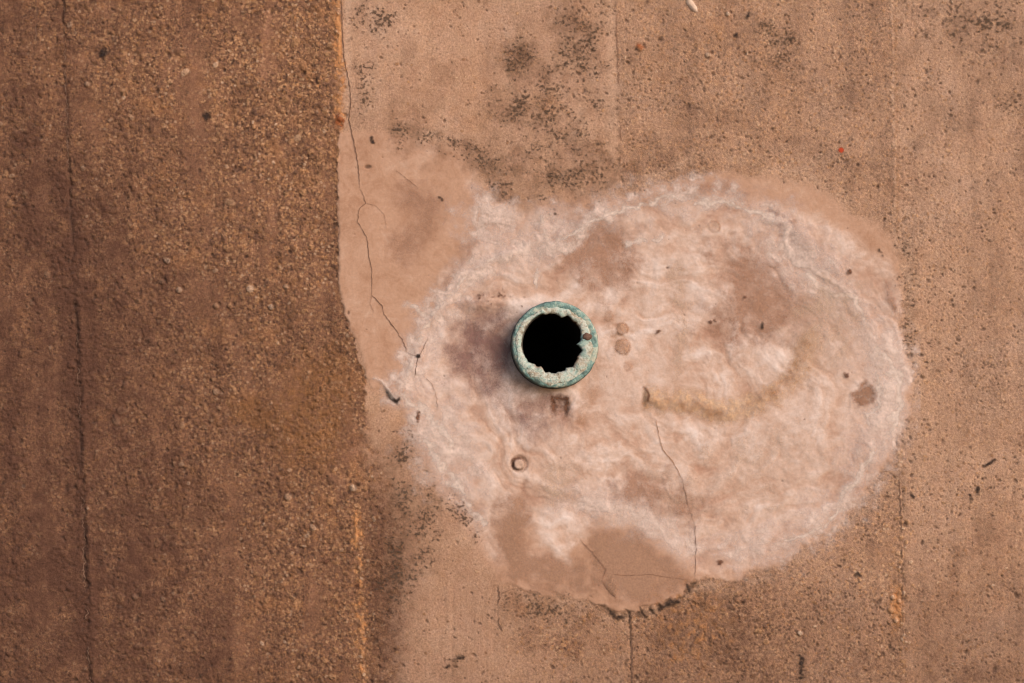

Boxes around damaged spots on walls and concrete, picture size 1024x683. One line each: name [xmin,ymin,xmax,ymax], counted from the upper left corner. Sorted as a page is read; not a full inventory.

crack [341,0,438,405]
damp [374,8,921,624]
crack [584,423,697,682]